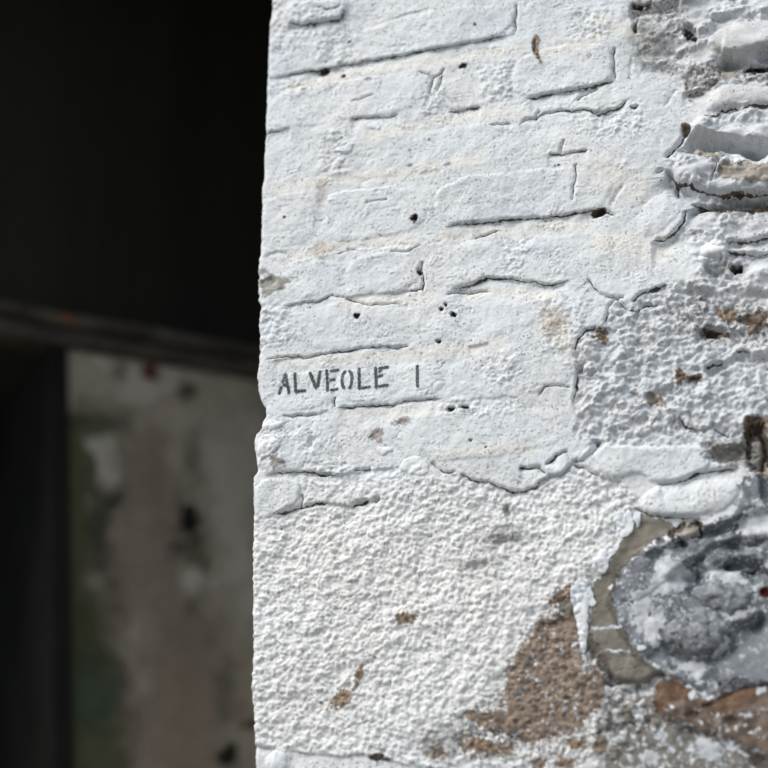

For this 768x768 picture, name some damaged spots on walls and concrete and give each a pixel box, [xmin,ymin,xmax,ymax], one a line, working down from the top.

spalling [633,0,697,68]
crack [539,280,667,401]
spalling [676,297,768,343]
spalling [423,415,768,768]